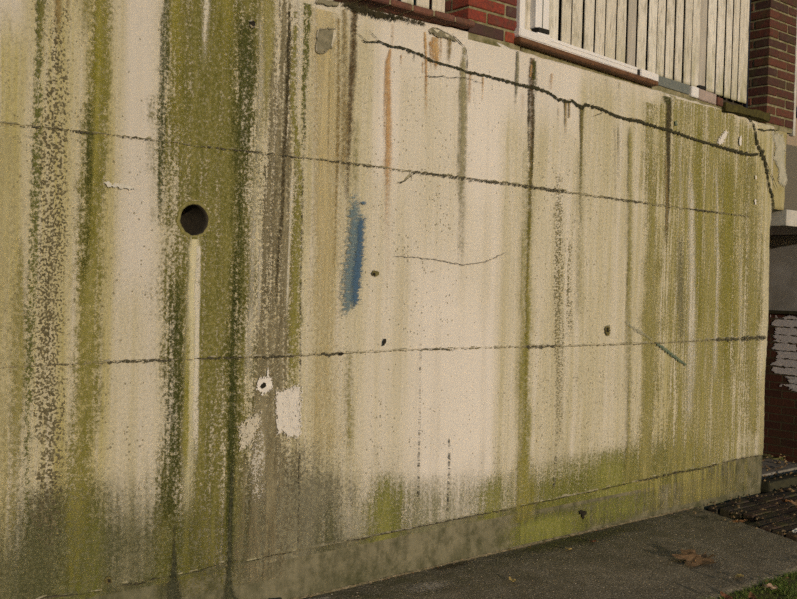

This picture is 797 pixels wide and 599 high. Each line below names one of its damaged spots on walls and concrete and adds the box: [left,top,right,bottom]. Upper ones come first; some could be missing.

spalling [315,26,337,54]
crack [0,79,750,217]
rust [384,49,392,194]
rust [422,31,452,92]
damp [458,47,471,216]
crack [359,30,779,213]
damp [0,0,131,599]
damp [162,237,201,516]
damp [215,0,358,599]
crack [397,253,504,265]
damp [478,58,723,526]
peeling [770,315,797,392]